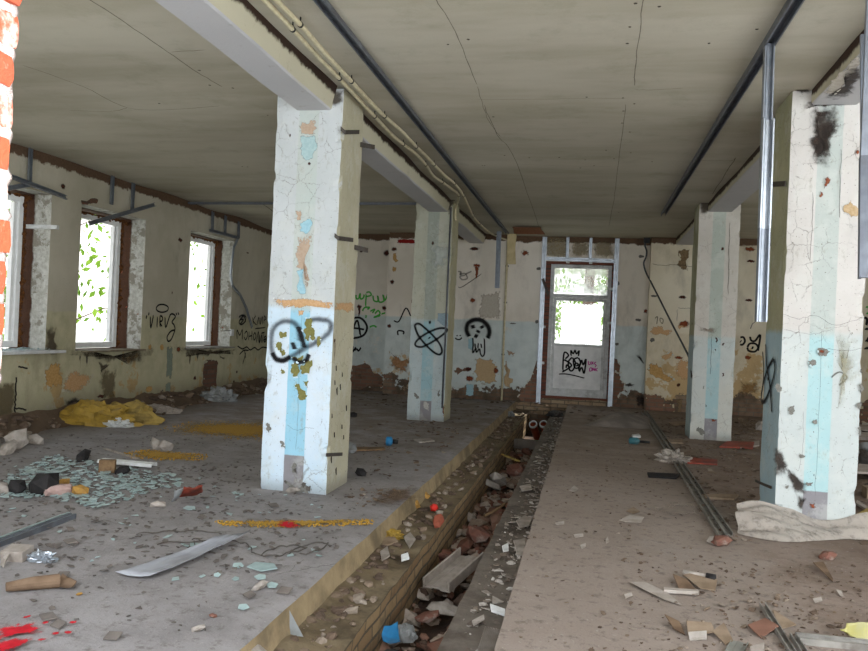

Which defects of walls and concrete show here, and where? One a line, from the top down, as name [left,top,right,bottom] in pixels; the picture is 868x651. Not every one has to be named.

peeling [300,120,317,160]
crack [436,0,539,227]
leakage [808,102,843,163]
peeling [273,211,353,348]
peeling [44,362,91,393]
flaking render [335,363,383,395]
peeling [389,351,409,372]
peeling [648,351,688,383]
flaking render [646,394,675,412]
leakage [788,470,805,509]